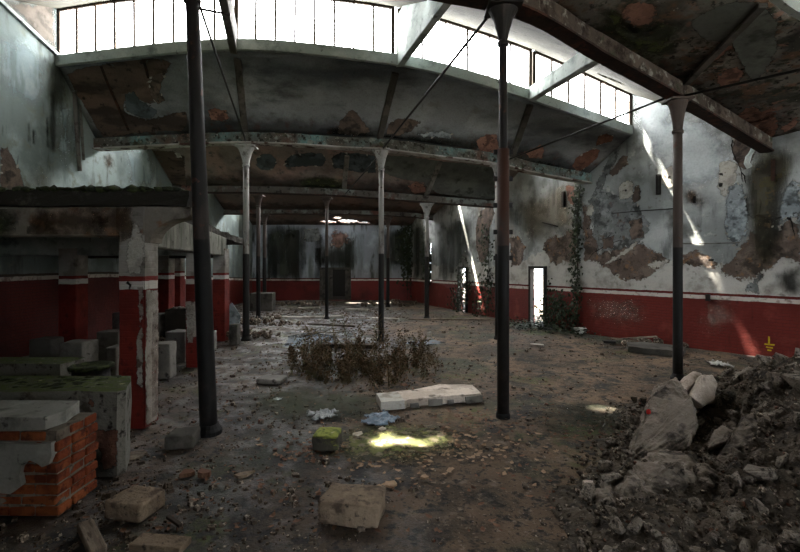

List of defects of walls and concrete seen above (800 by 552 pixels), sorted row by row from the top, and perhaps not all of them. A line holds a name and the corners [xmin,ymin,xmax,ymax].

peeling [622,1,659,28]
peeling [0,148,24,190]
peeling [387,118,453,139]
peeling [732,138,755,171]
peeling [738,106,800,137]
damp [266,227,306,281]
damp [316,239,356,277]
peeling [476,208,495,262]
peeling [542,133,670,282]
peeling [683,180,800,282]
damp [746,152,791,262]
flaking render [136,287,159,425]